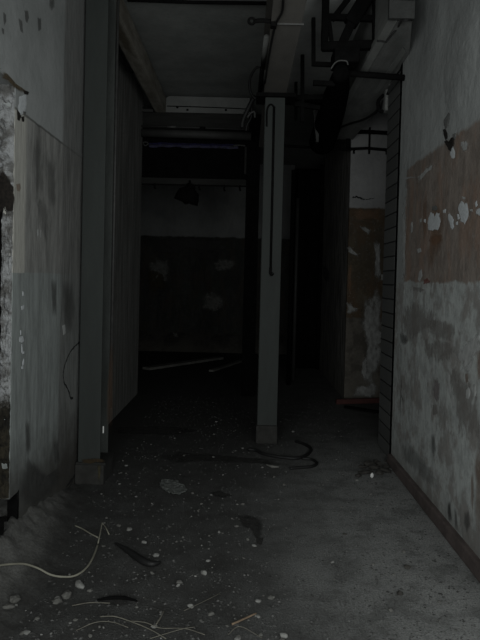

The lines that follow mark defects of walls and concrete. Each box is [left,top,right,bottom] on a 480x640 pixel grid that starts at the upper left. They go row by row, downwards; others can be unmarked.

spalling [443,113,467,158]
peeling [402,196,480,274]
spalling [0,73,29,522]